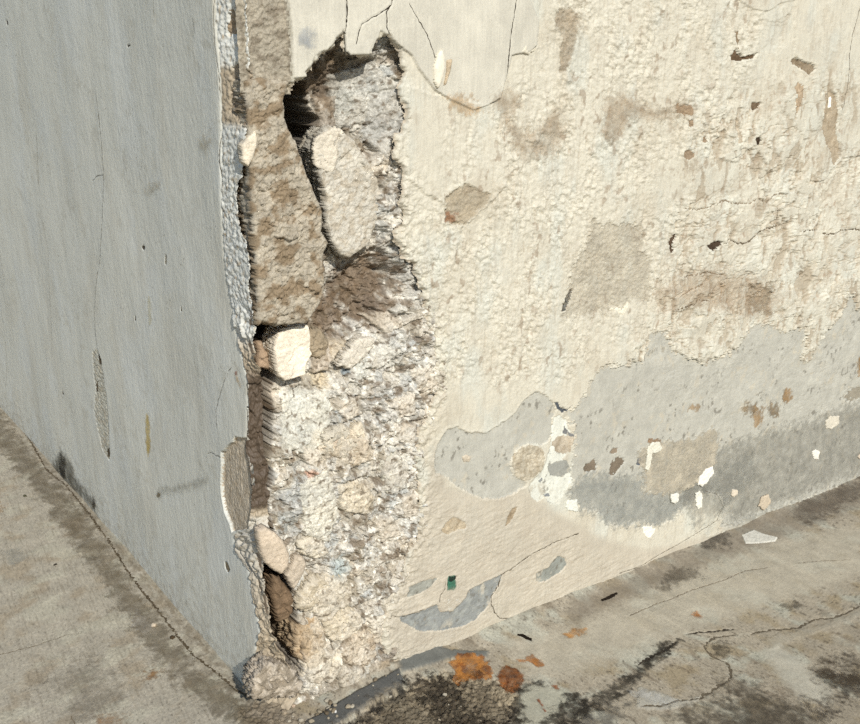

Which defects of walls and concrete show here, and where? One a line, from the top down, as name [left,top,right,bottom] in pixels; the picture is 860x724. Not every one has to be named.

crack [344,0,435,57]
crack [507,0,517,73]
flaking render [222,0,860,705]
peeling [92,349,110,459]
damp [55,452,95,509]
crack [631,567,769,615]
damp [349,672,543,724]
corrosion [449,653,544,693]
damp [541,638,684,724]
crack [638,603,860,707]
damp [679,653,860,724]